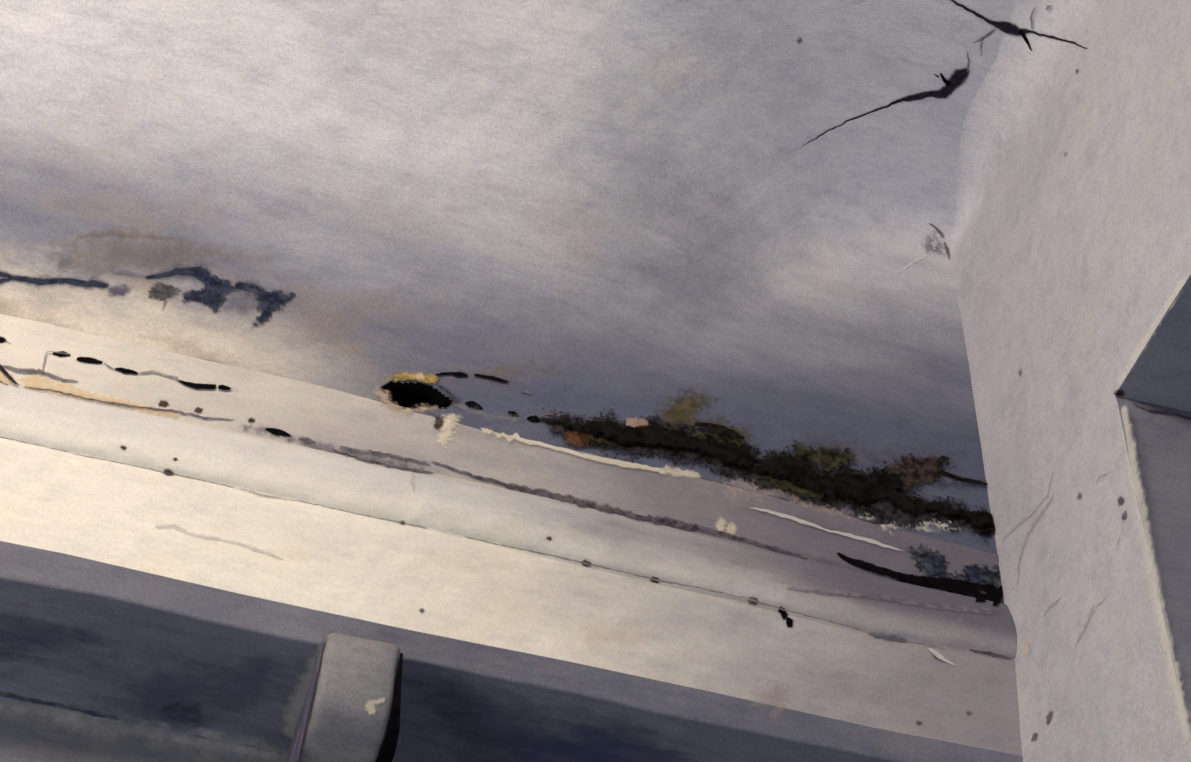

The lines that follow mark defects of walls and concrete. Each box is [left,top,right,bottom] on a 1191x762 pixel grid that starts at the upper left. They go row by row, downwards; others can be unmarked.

crack [802,0,1087,147]
crack [0,340,233,420]
spalling [376,372,509,445]
crack [460,391,565,422]
crack [0,437,427,529]
crack [156,524,282,559]
crack [369,450,806,559]
crack [464,536,946,649]
leakage [540,391,1001,600]
crack [837,472,1053,606]
crack [376,653,403,762]